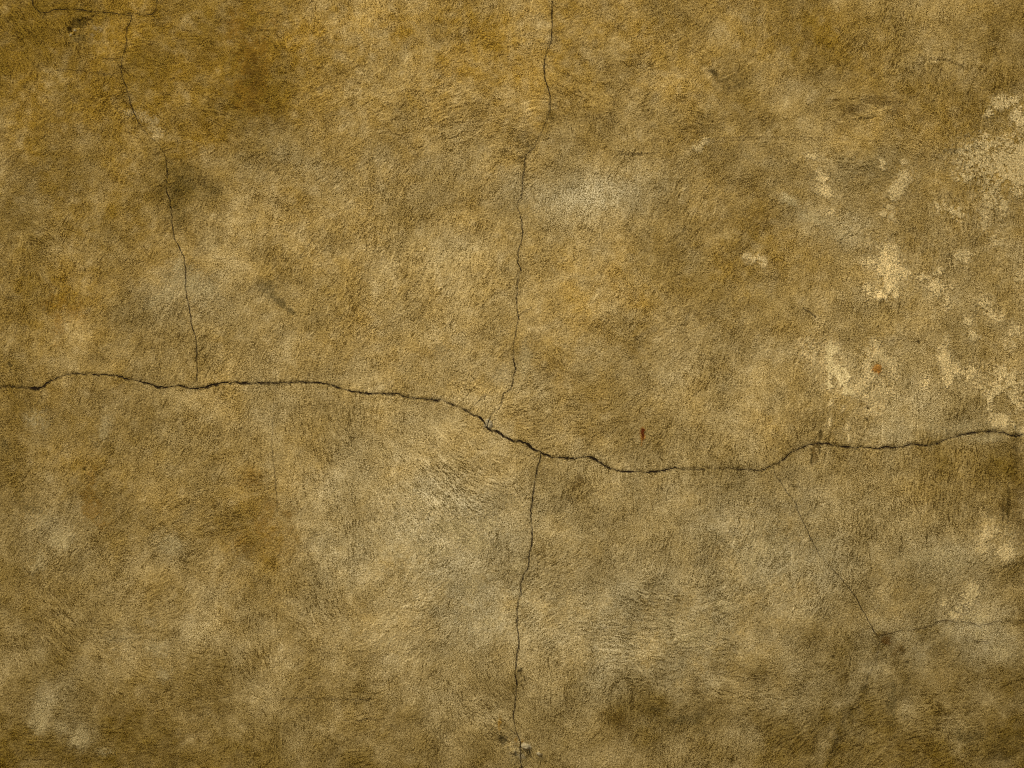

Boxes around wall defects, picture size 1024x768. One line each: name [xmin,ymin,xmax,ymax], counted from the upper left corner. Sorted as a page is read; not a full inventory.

crack [0,0,705,768]
crack [731,431,1023,536]
crack [849,588,1002,642]